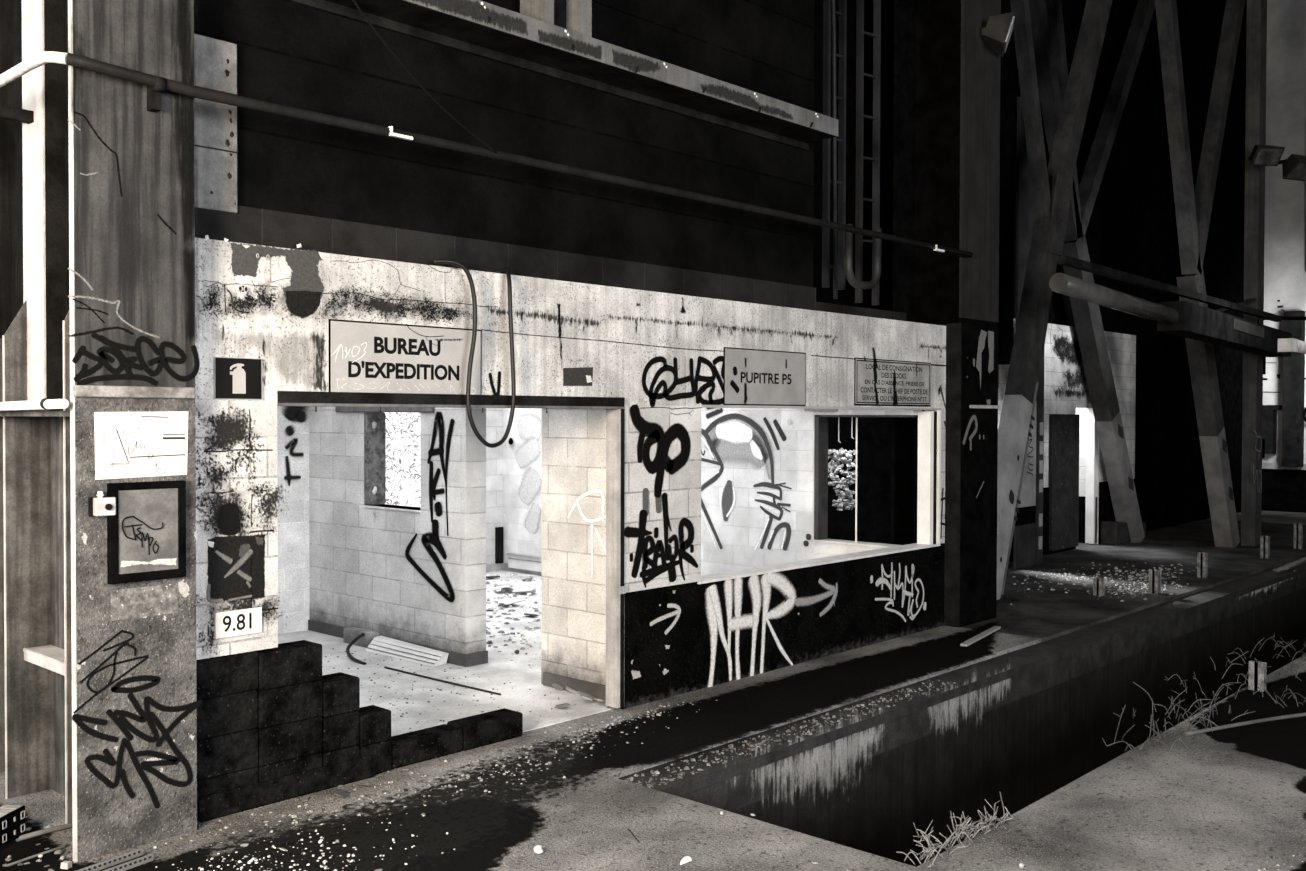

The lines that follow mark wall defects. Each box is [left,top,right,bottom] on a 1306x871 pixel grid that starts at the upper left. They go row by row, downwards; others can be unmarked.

water stain [312,285,472,391]
water stain [488,305,836,346]
water stain [196,401,289,538]